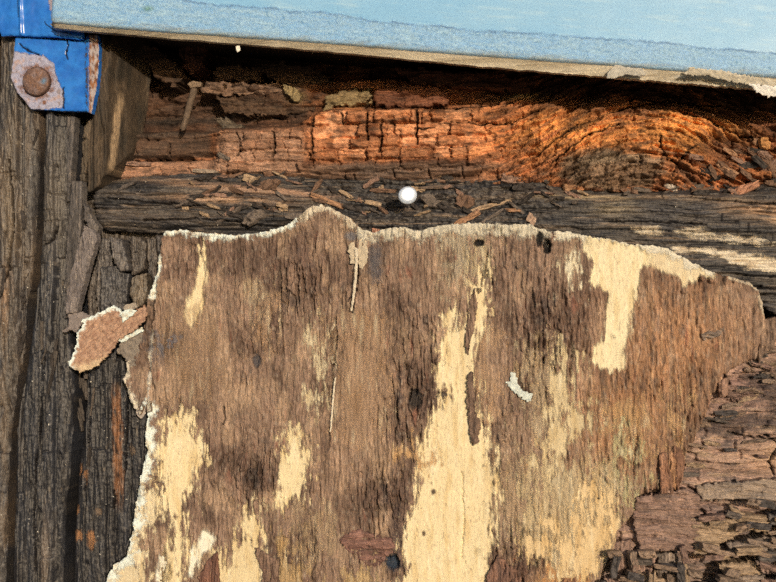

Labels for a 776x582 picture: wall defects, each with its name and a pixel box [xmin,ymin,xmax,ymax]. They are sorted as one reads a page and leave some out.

crack [366,112,383,152]
peeling [184,238,208,327]
peeling [244,281,281,359]
peeling [301,306,396,450]
peeling [392,232,715,582]
peeling [724,439,768,452]
crack [32,454,40,565]
peeling [110,403,319,582]
peeling [342,553,378,582]